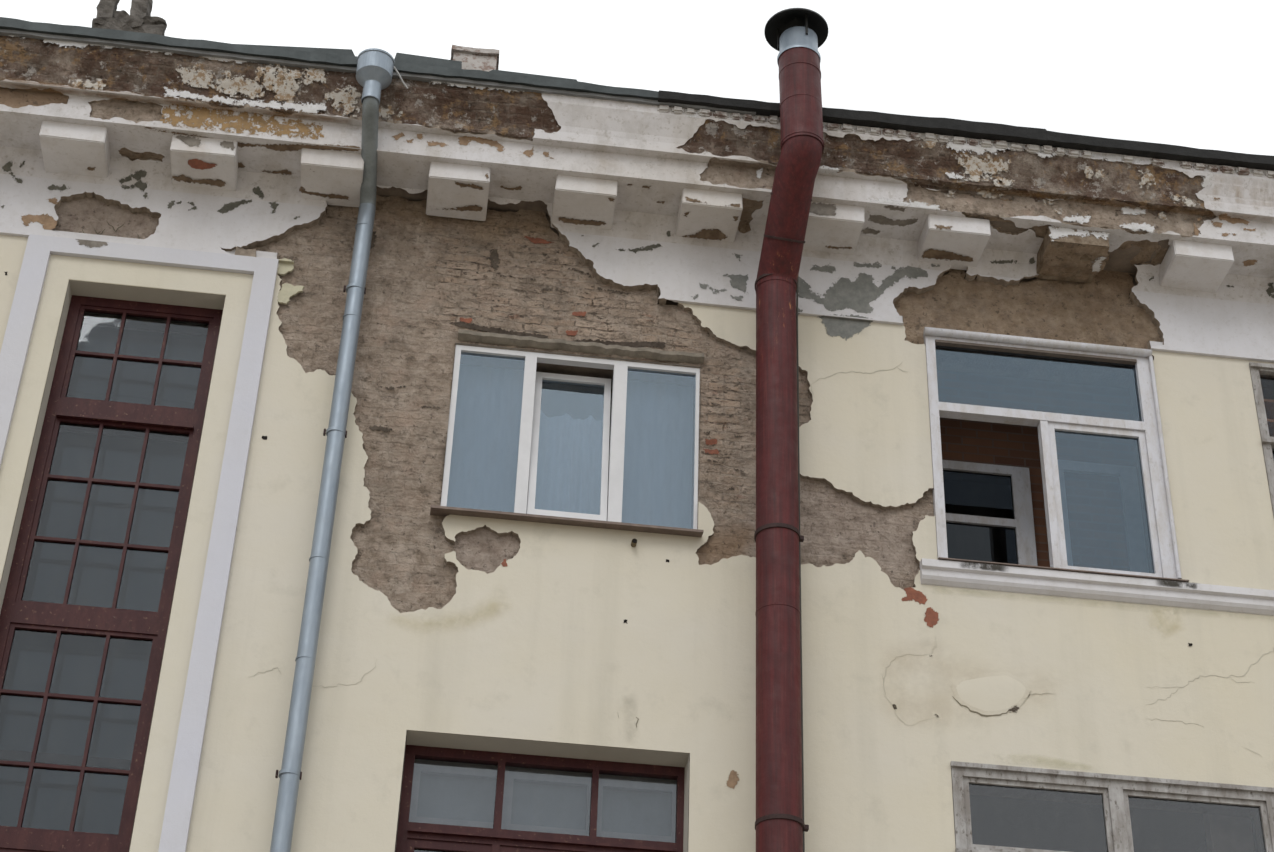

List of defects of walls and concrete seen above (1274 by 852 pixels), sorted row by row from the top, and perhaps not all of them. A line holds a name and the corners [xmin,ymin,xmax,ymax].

spalling [21,147,197,248]
spalling [0,35,363,187]
peeling [217,186,279,214]
spalling [253,186,359,375]
spalling [379,77,571,159]
spalling [455,173,522,190]
spalling [616,112,781,253]
spalling [798,122,1256,349]
spalling [351,195,756,613]
spalling [799,370,812,427]
spalling [800,478,939,627]
crack [1146,648,1274,726]